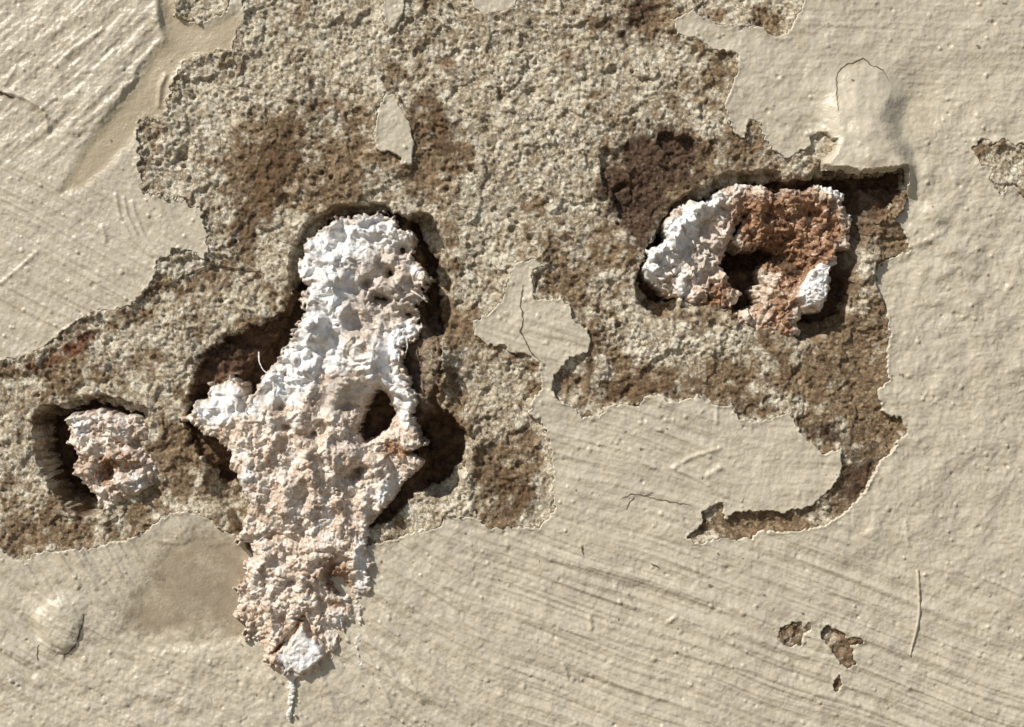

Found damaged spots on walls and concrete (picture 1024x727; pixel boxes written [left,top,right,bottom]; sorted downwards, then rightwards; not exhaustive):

crack [836,58,888,110]
peeling [971,139,1024,198]
spalling [0,0,910,563]
damp [596,123,853,338]
damp [64,406,157,510]
damp [180,210,436,721]
peeling [778,622,863,692]